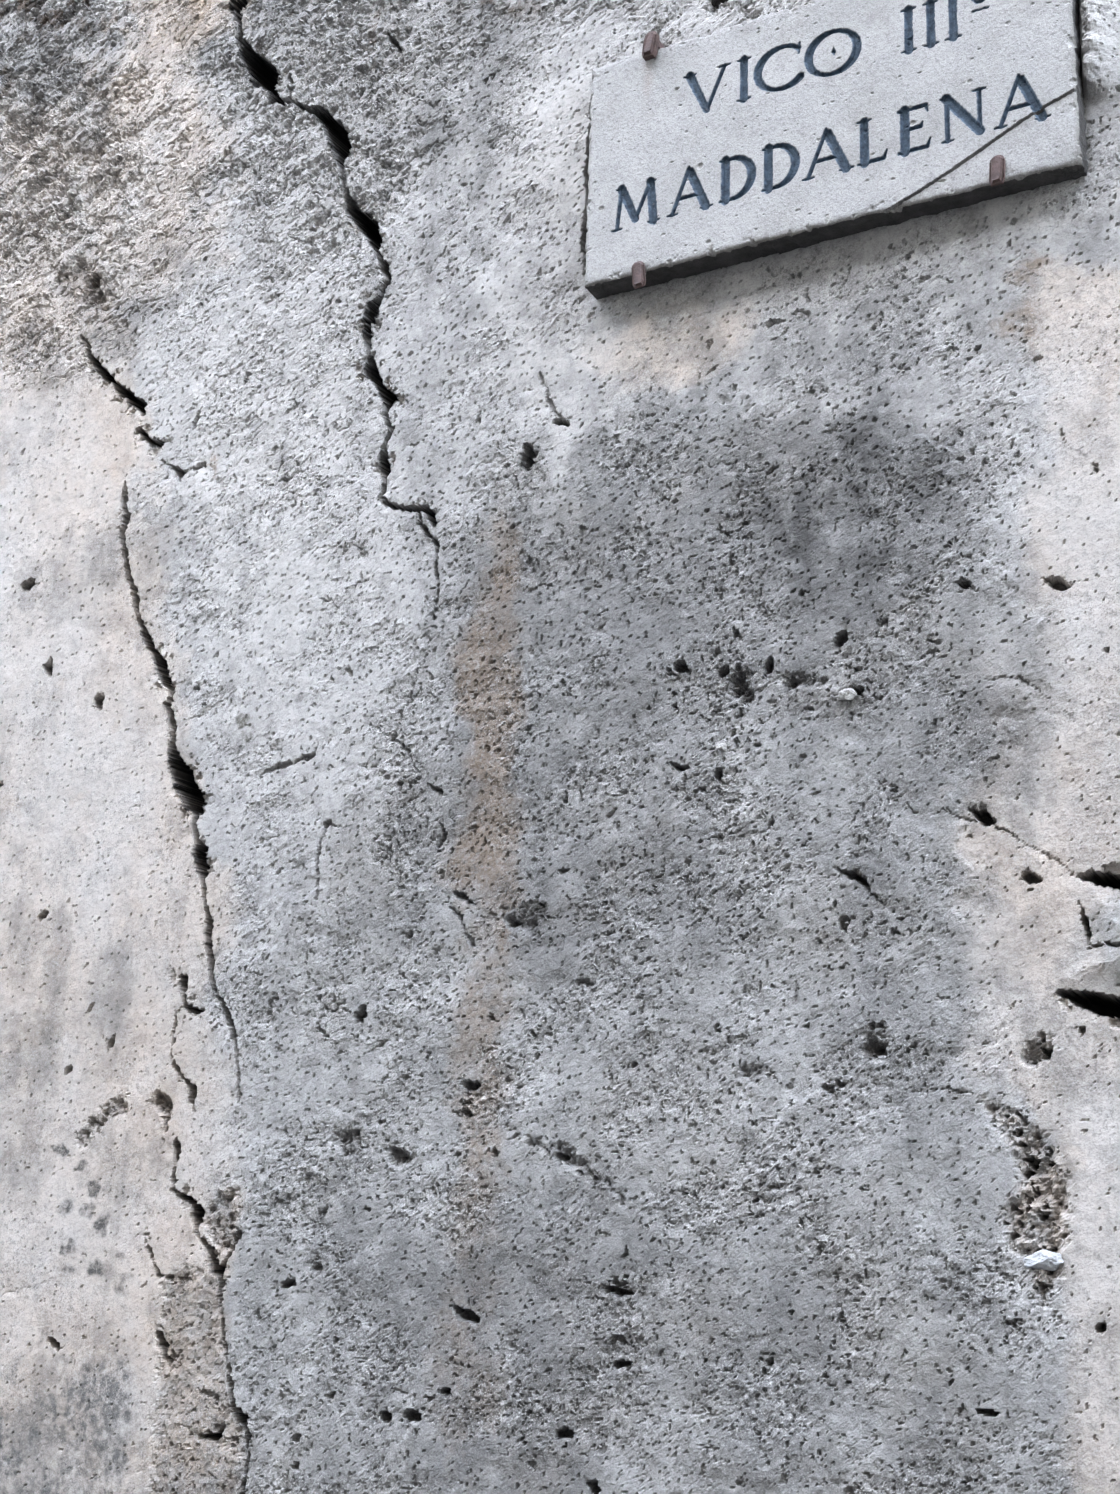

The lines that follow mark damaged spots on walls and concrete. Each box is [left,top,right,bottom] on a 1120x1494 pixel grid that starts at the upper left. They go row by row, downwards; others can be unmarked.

crack [79,335,207,481]
crack [228,0,448,853]
crack [977,674,1076,723]
crack [118,480,252,1494]
crack [313,819,347,901]
crack [446,890,476,948]
crack [886,796,1120,951]
crack [1054,988,1120,1020]
spalling [968,1082,1081,1317]